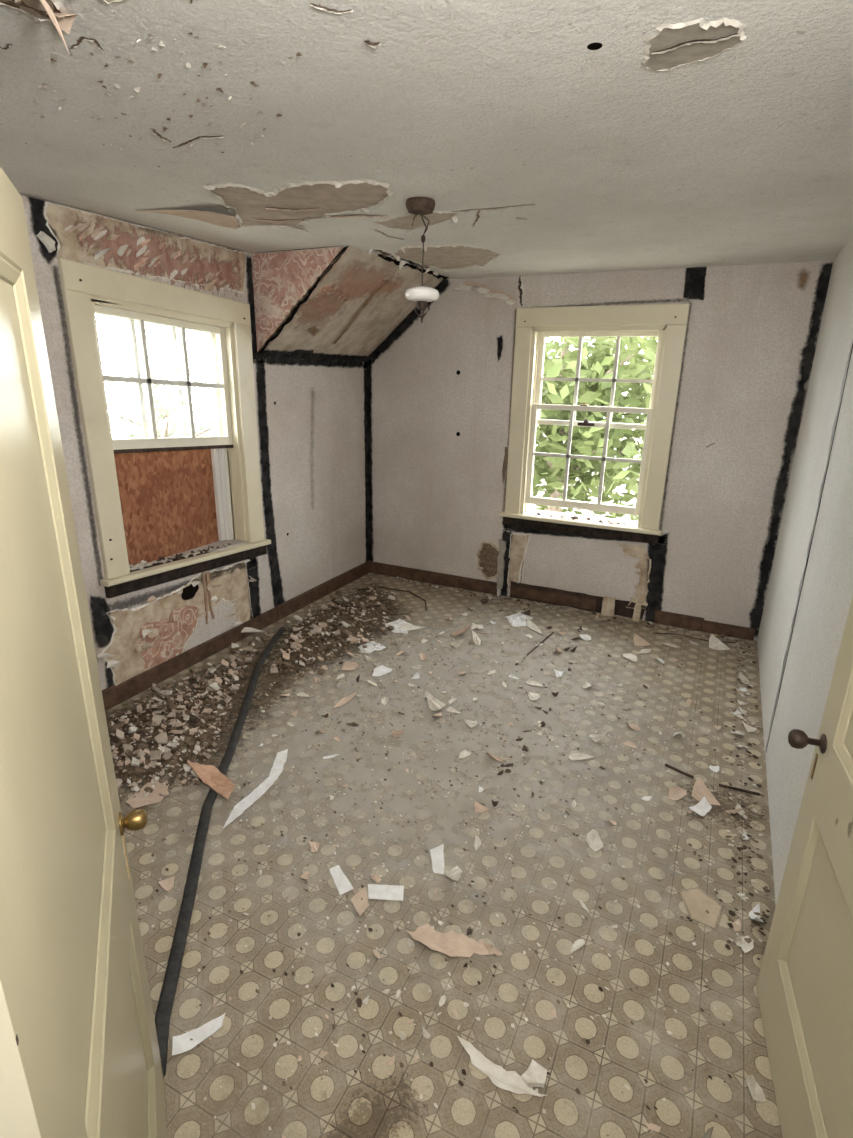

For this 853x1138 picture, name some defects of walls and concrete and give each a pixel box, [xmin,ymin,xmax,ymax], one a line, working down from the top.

peeling [0,0,135,67]
peeling [91,81,233,151]
peeling [138,179,502,274]